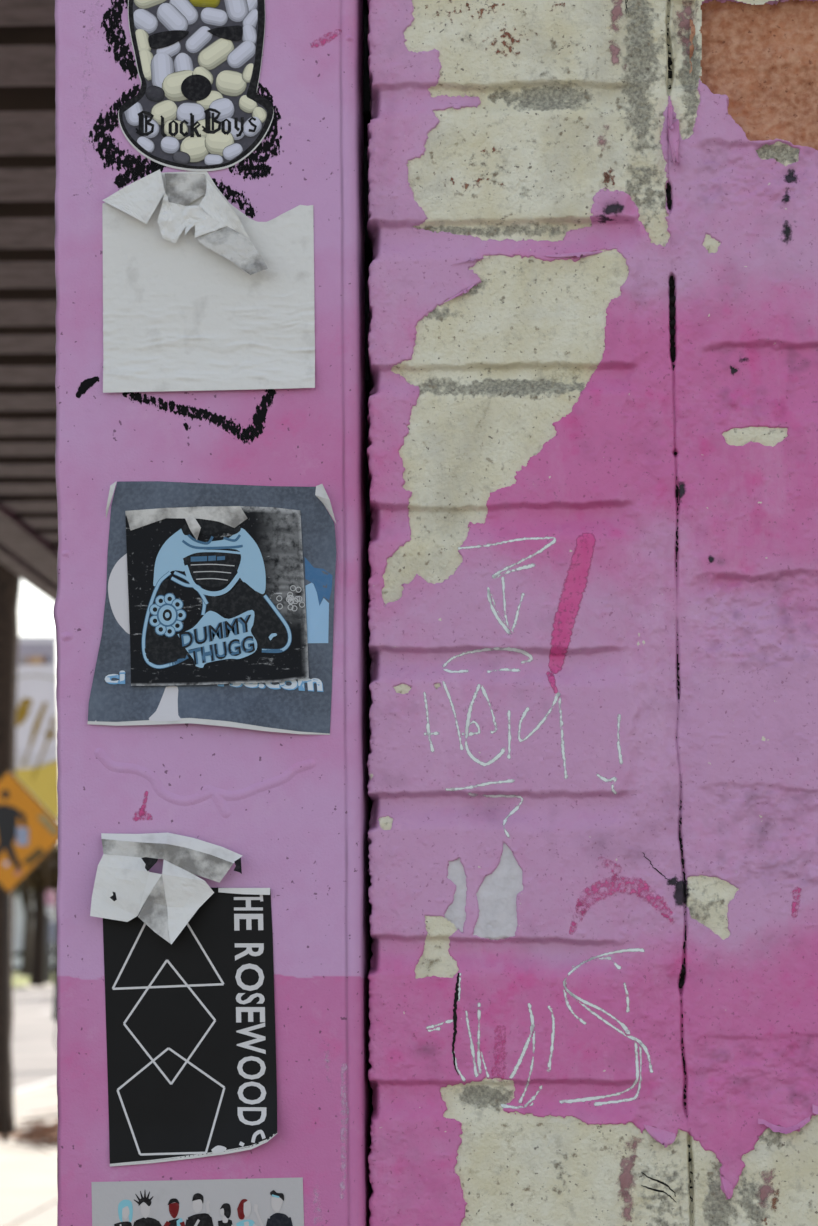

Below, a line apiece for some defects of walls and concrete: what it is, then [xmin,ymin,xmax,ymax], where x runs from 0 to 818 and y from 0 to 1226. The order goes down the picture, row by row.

crack [665,0,673,89]
crack [665,183,673,210]
peeling [382,0,818,604]
crack [668,276,676,371]
crack [673,437,681,577]
crack [674,634,682,738]
peeling [415,844,523,979]
peeling [686,875,739,940]
crack [641,781,693,1221]
peeling [440,1078,818,1226]